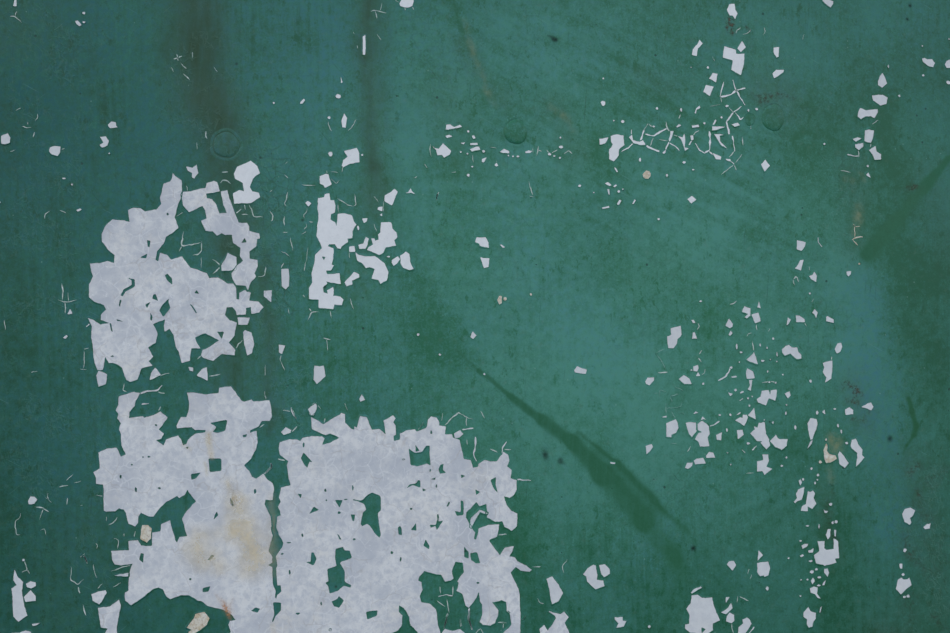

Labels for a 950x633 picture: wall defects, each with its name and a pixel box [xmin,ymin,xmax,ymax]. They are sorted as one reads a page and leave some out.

peeling [690,39,704,69]
peeling [702,65,718,97]
peeling [722,40,747,77]
peeling [772,46,786,79]
peeling [921,45,950,85]
peeling [424,123,532,177]
peeling [644,319,706,386]
peeling [86,147,571,633]
peeling [662,301,874,475]
peeling [10,558,40,633]
peeling [582,563,611,591]
peeling [684,585,755,633]